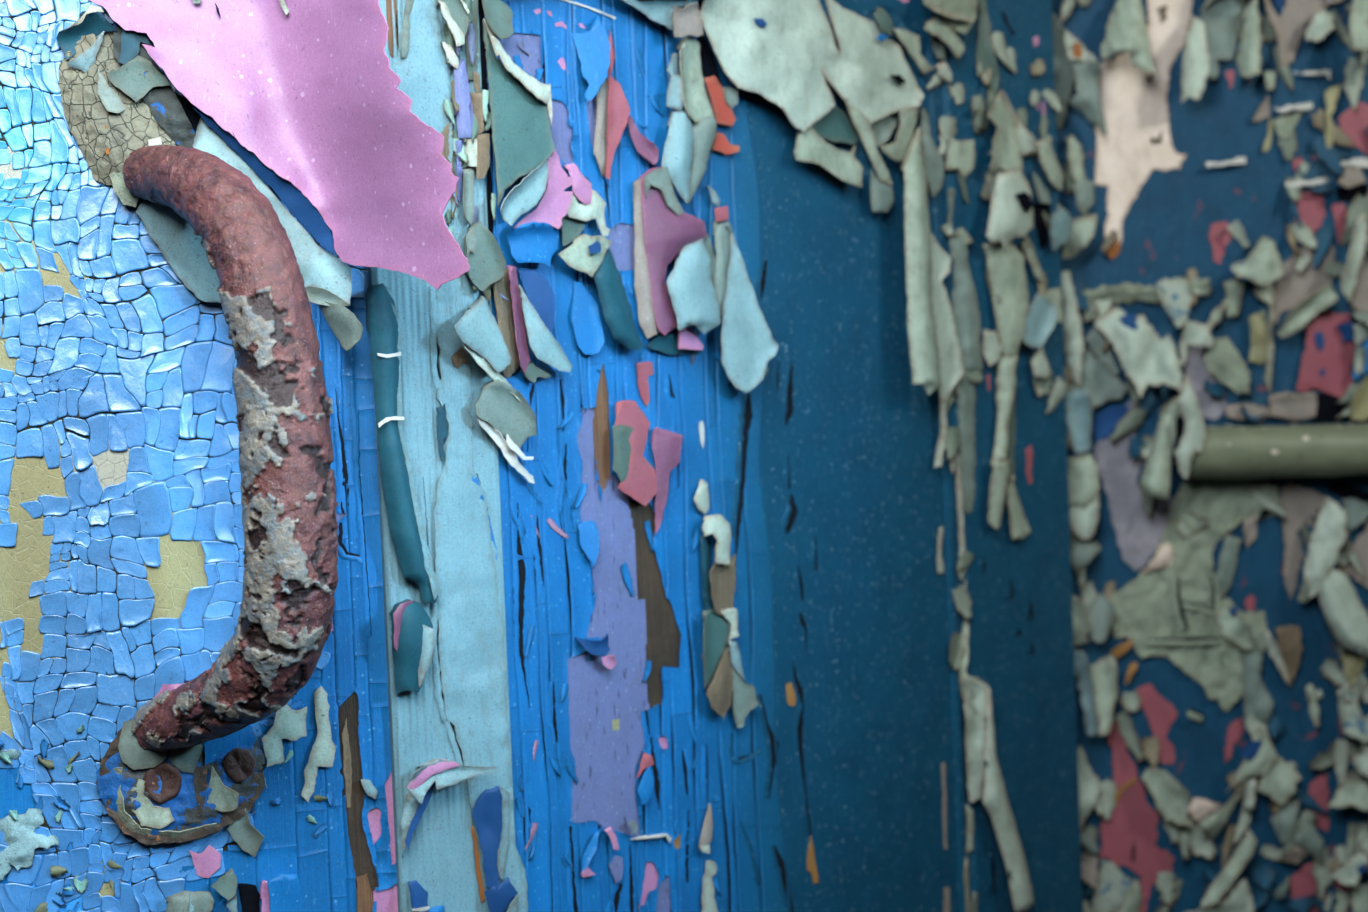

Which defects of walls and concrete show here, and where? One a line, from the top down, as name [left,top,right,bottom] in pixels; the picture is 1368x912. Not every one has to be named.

peeling [548,31,678,295]
peeling [1042,0,1193,260]
peeling [1225,0,1368,428]
peeling [0,435,130,823]
peeling [140,477,219,631]
crack [0,0,397,912]
crack [417,477,428,544]
peeling [510,334,682,861]
crack [472,0,818,912]
peeling [1070,346,1270,614]
rust [100,728,265,845]
peeling [1081,637,1368,912]